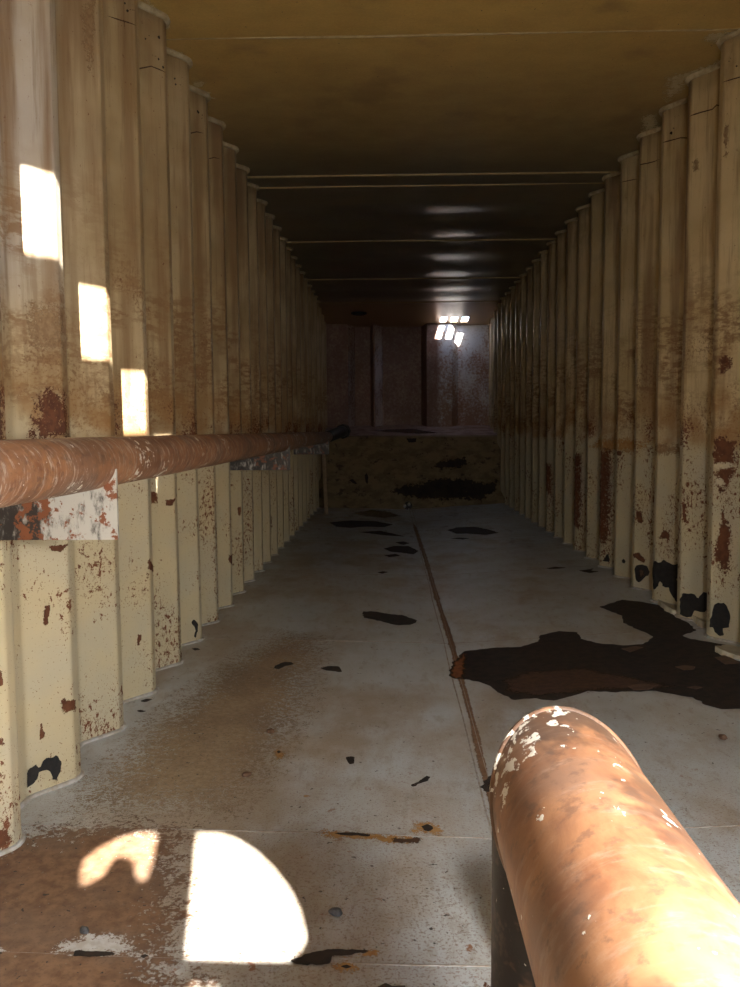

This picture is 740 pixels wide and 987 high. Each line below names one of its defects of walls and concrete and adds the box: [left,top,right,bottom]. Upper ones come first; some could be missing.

peeling [574,453,583,529]
peeling [599,448,623,562]
peeling [712,434,737,577]
spalling [449,552,740,709]
spalling [27,755,62,788]
rust [0,814,230,987]